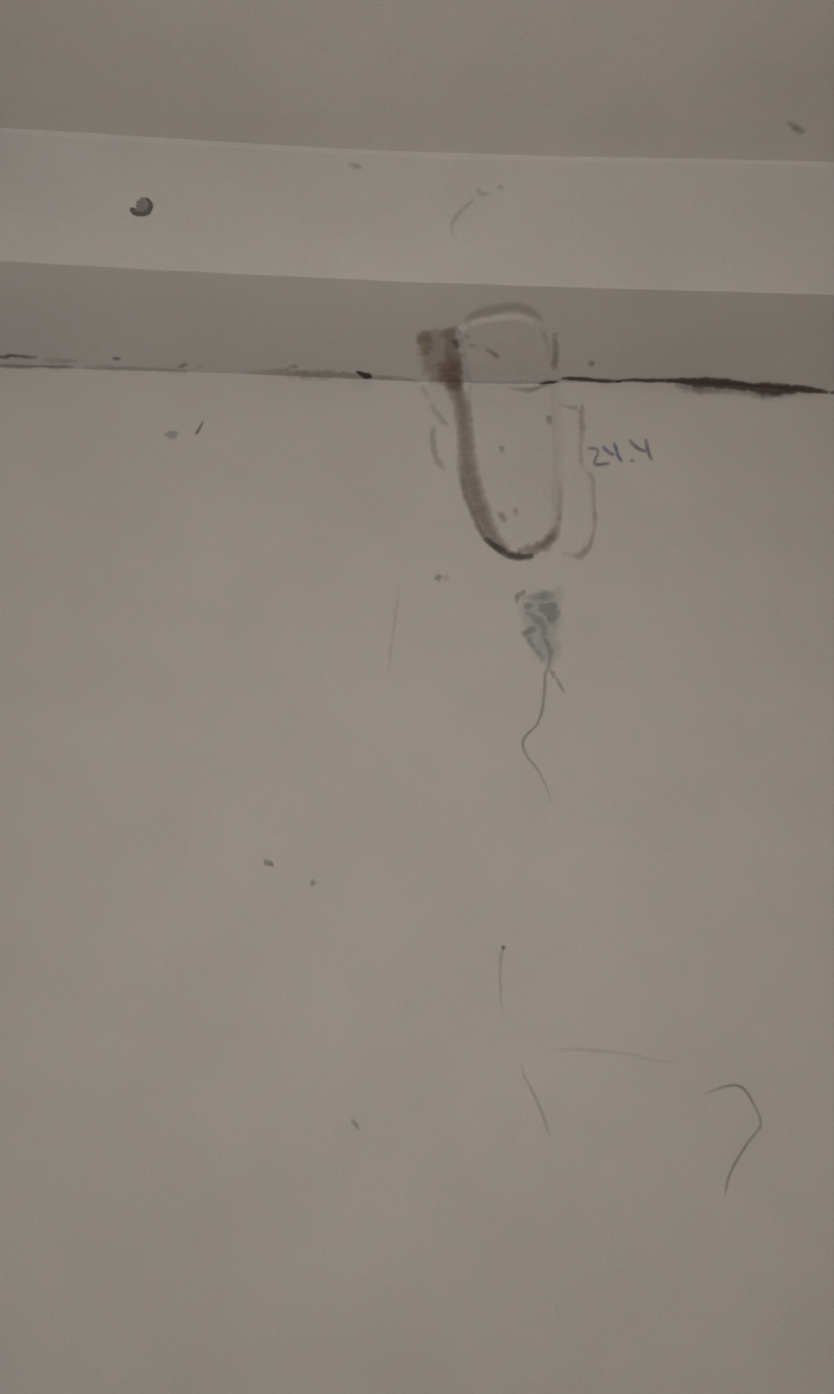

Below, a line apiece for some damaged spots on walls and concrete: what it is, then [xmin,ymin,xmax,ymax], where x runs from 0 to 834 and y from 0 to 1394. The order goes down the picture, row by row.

crack [356,371,372,379]
crack [541,377,834,395]
water stain [456,394,553,559]